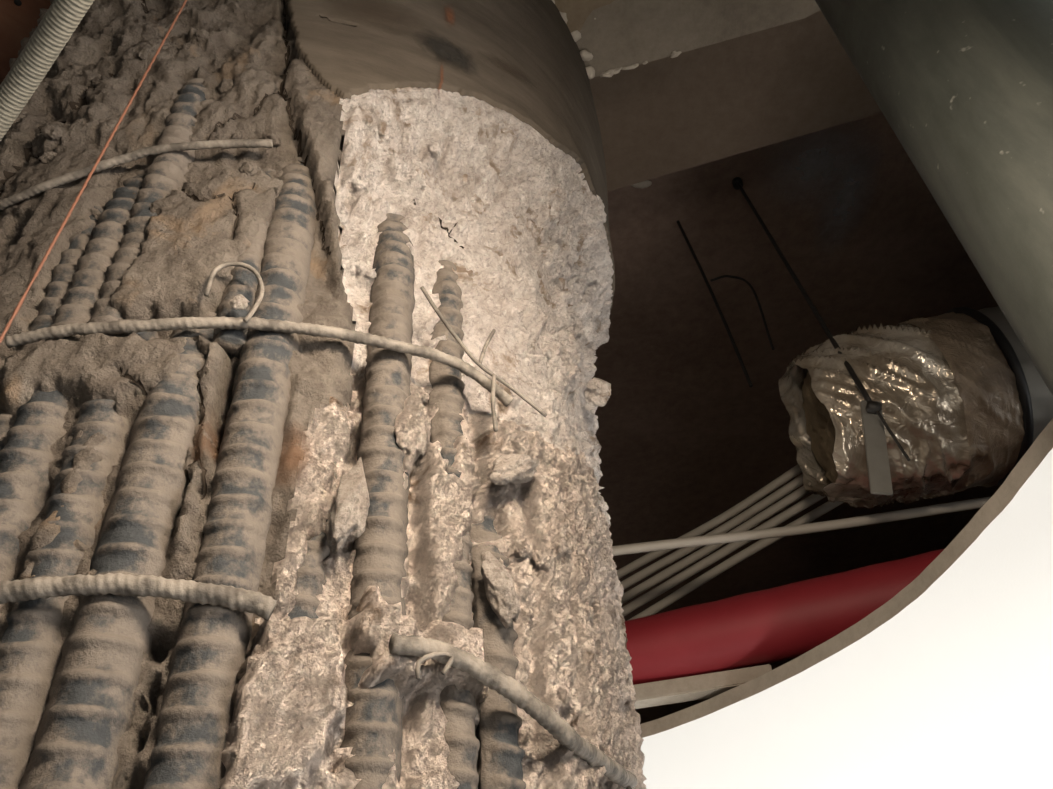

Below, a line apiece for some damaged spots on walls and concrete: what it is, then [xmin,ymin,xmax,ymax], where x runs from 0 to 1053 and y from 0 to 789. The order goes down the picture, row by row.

crack [119,367,148,397]
crack [184,371,219,500]
spalling [0,0,648,789]